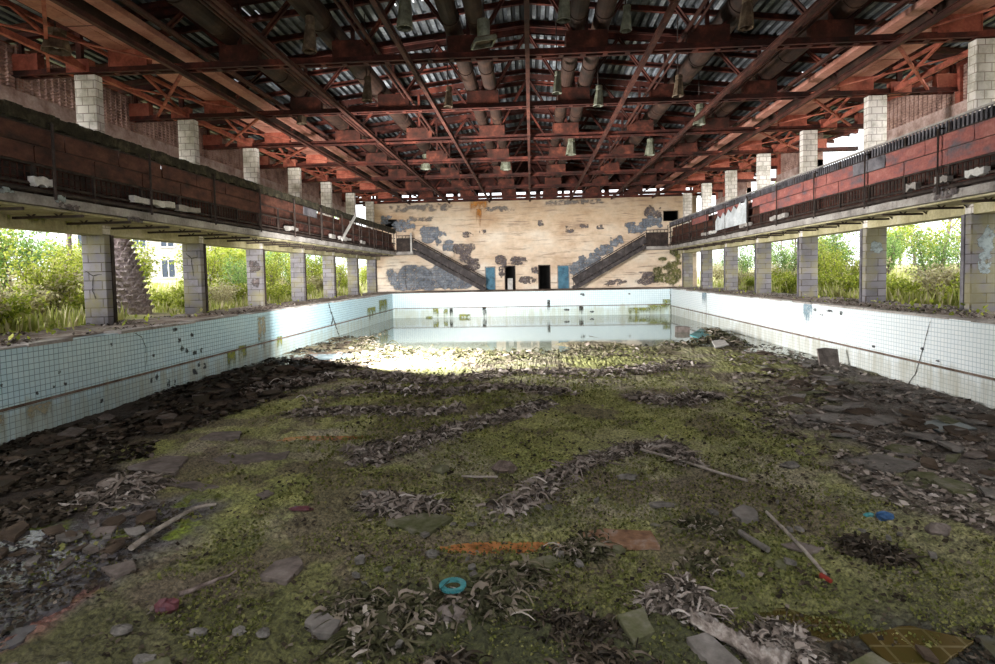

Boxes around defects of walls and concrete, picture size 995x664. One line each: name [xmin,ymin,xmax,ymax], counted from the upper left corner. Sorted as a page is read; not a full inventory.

peeling [381,215,486,291]
peeling [565,205,663,275]
peeling [977,225,995,274]
peeling [604,272,658,294]
peeling [173,328,206,374]